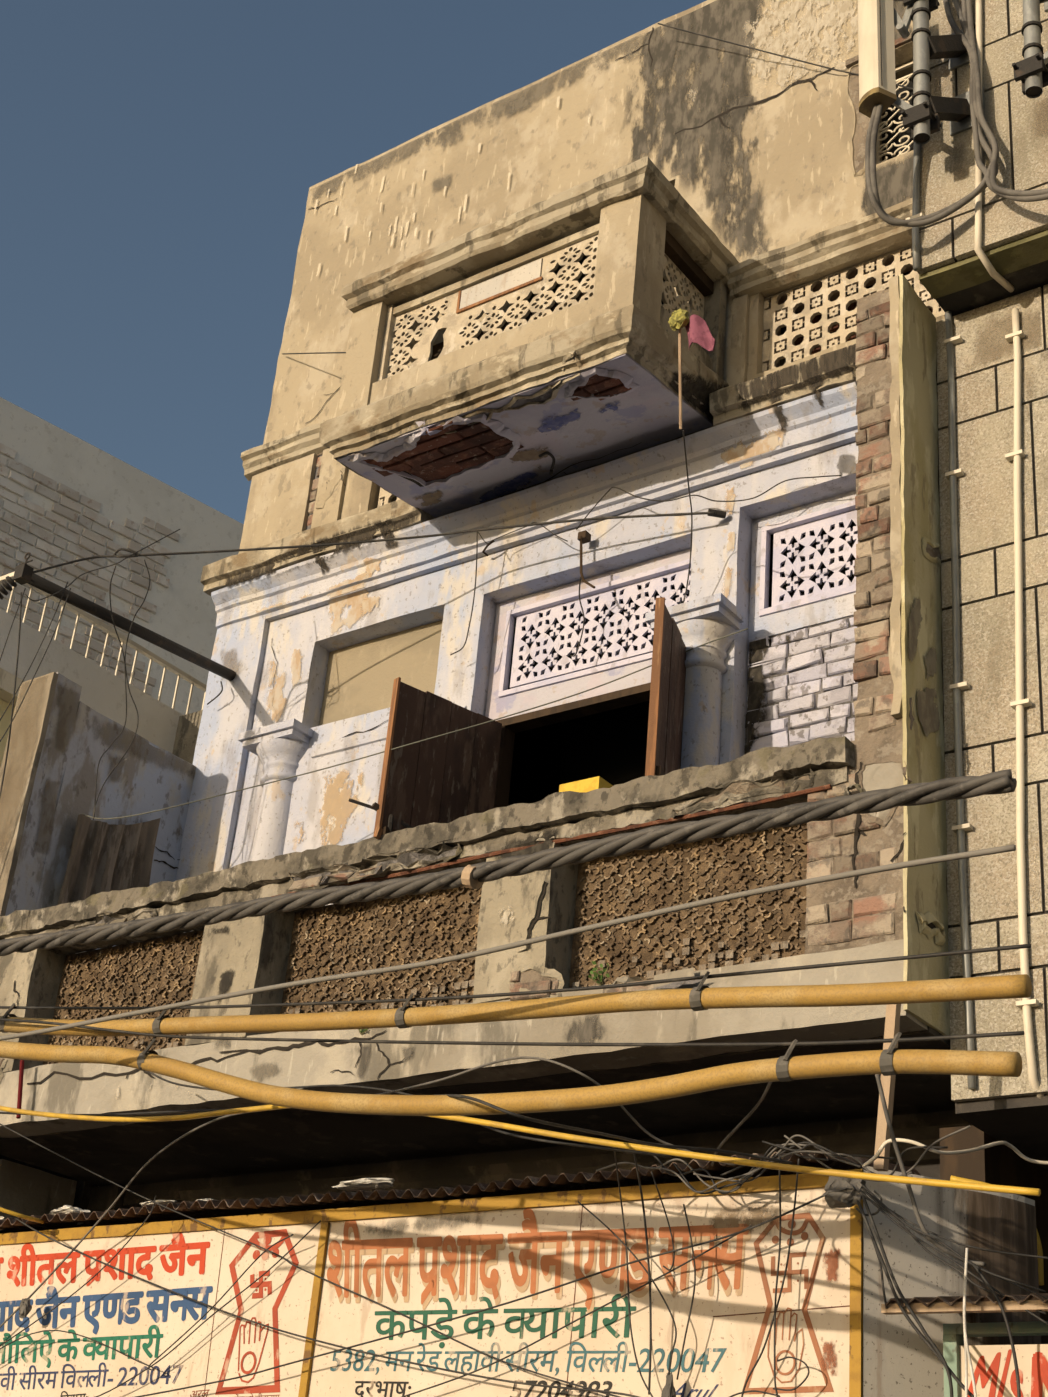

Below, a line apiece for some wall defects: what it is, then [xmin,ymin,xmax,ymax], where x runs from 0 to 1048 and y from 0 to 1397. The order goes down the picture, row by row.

leakage [313,0,776,255]
crack [675,67,835,134]
leakage [861,155,913,216]
spalling [348,351,639,487]
leakage [670,344,857,431]
peeling [256,557,381,633]
peeling [268,649,302,723]
peeling [319,771,362,845]
spalling [287,838,463,892]
crack [517,879,551,952]
crack [27,1069,154,1085]
crack [191,1030,407,1079]